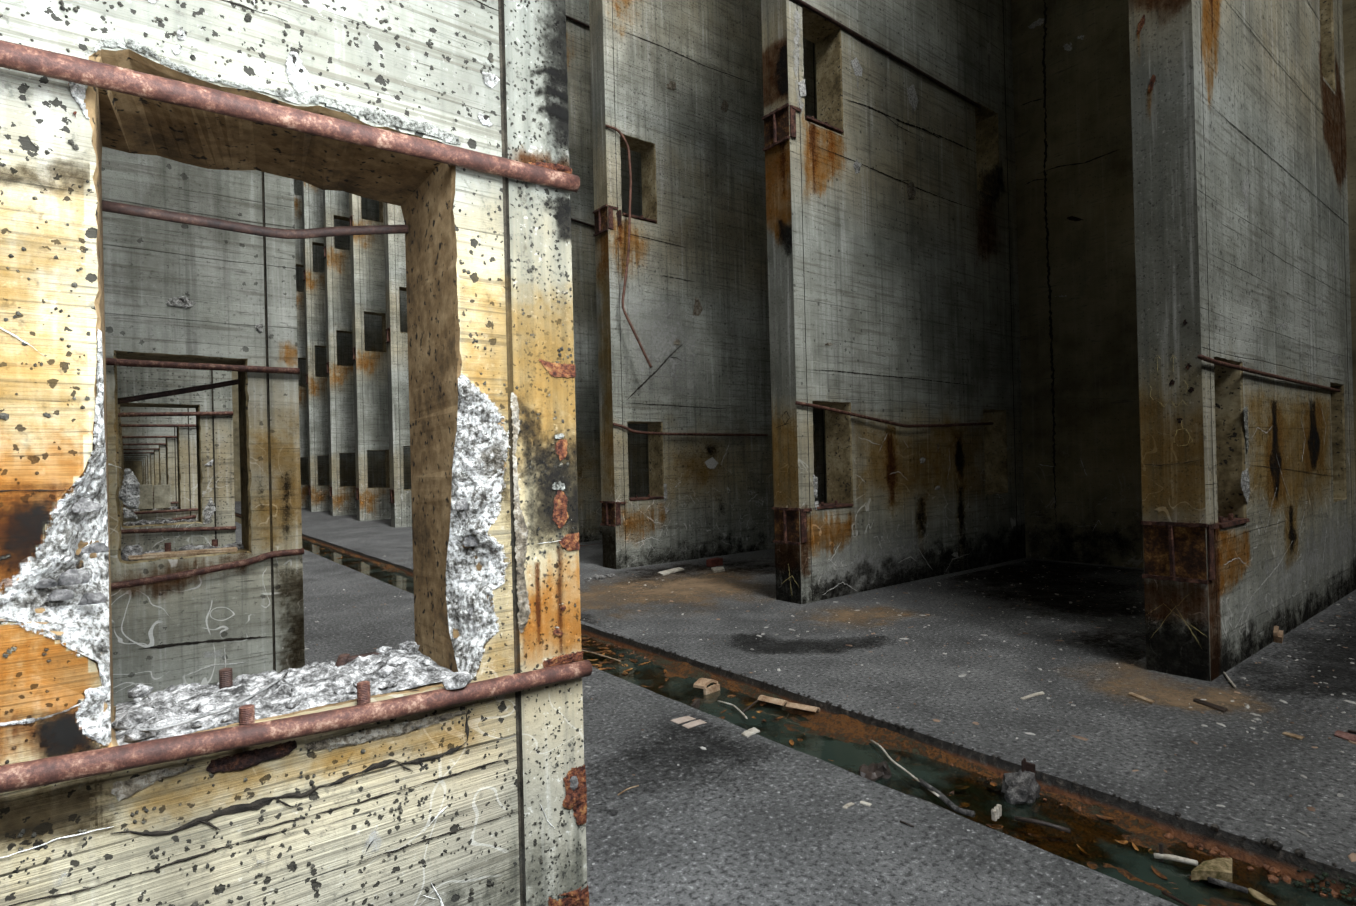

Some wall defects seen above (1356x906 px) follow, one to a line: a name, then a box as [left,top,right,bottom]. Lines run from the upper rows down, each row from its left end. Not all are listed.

corrosion [1320,45,1347,184]
crack [1021,0,1117,528]
damp [1270,405,1281,497]
damp [1308,402,1320,467]
spalling [0,329,141,746]
spalling [446,374,531,679]
damp [580,572,741,602]
corrosion [563,764,587,825]
corrosion [548,885,589,906]